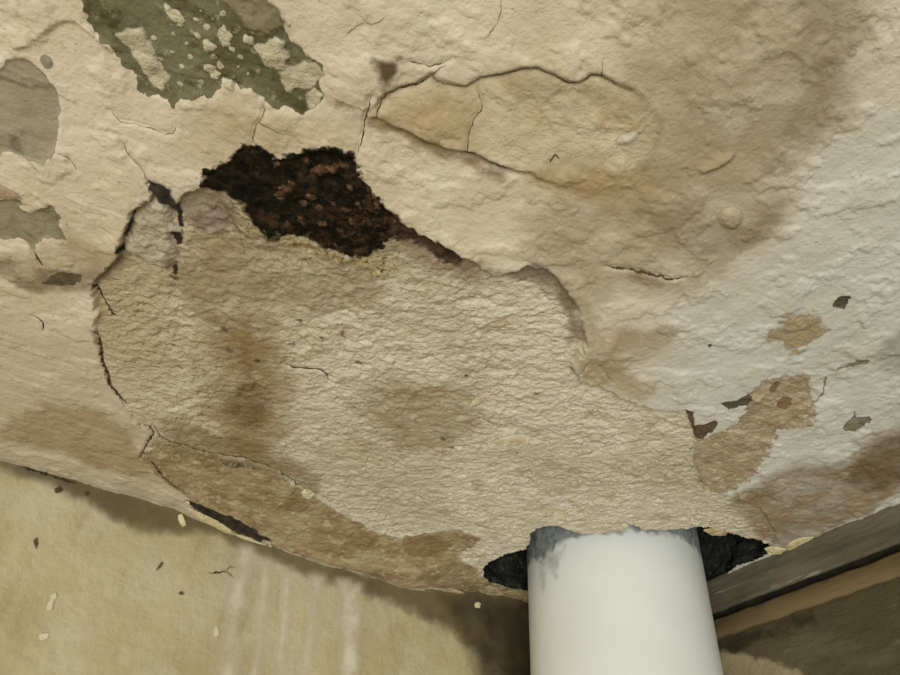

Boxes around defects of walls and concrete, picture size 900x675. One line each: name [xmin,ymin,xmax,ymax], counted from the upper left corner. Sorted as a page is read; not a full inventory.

peeling [0,54,61,165]
peeling [81,0,324,115]
crack [357,58,626,169]
water stain [623,0,815,252]
peeling [0,186,66,249]
crack [114,115,184,277]
crack [95,332,127,404]
flaking render [96,187,818,608]
peeling [767,313,831,356]
crack [140,425,322,547]
water stain [735,432,900,552]
water stain [0,460,531,675]